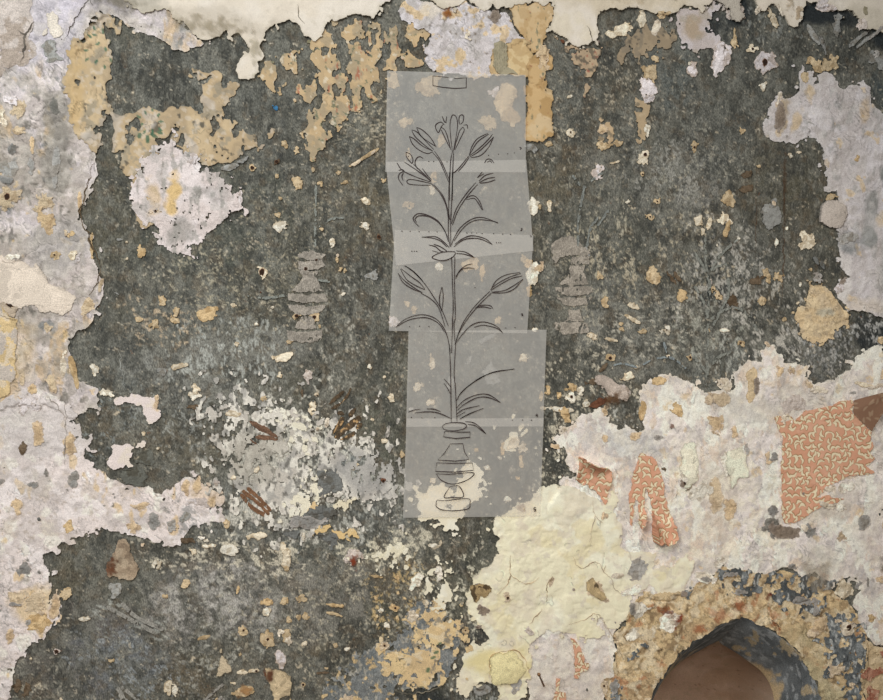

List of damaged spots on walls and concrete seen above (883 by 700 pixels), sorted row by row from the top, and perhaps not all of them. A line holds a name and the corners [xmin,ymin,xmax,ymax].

peeling [554,35,603,98]
flaking render [605,0,783,78]
flaking render [815,0,844,18]
peeling [634,77,658,144]
spalling [590,160,620,180]
spalling [527,197,552,216]
flaking render [694,189,736,236]
flaking render [762,58,883,347]
flaking render [525,261,539,286]
spalling [624,302,640,324]
flaking render [0,0,525,700]
flaking render [497,344,883,700]